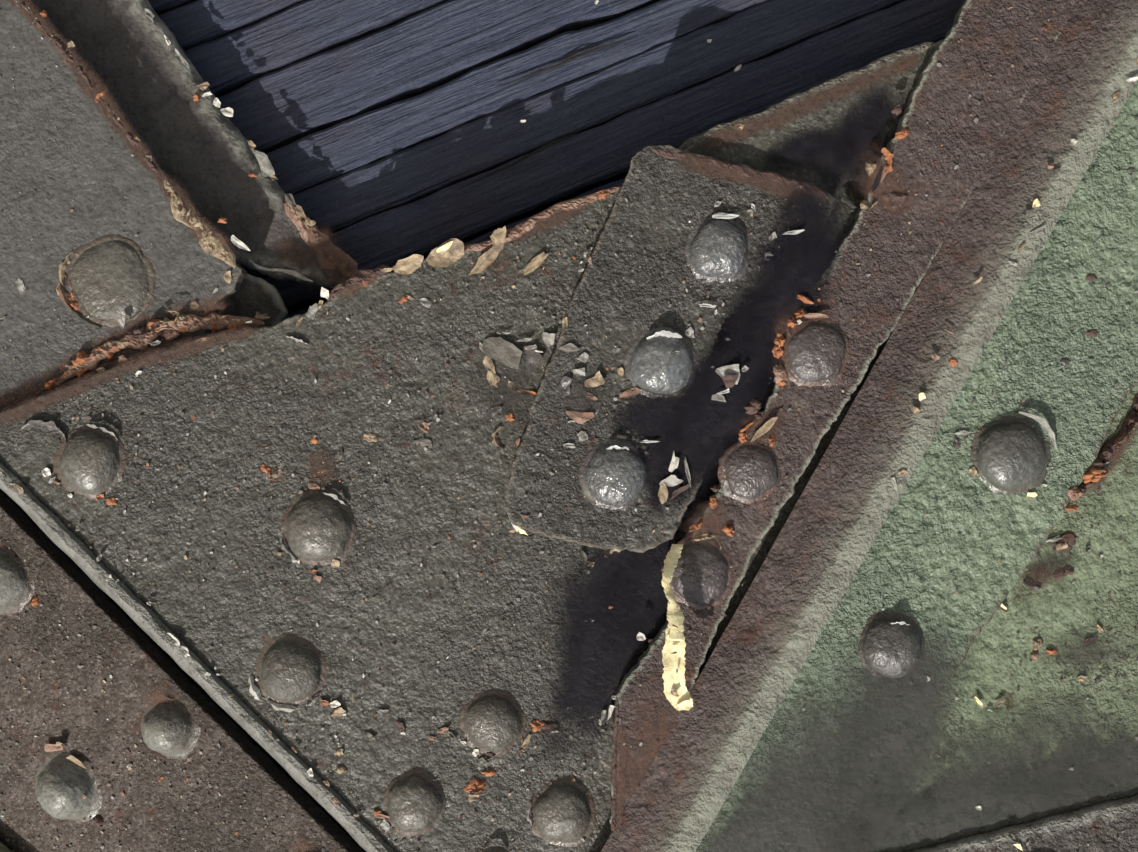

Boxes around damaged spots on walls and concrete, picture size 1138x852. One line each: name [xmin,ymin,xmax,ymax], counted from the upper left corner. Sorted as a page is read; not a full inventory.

corrosion [282,202,392,301]
corrosion [0,301,270,424]
corrosion [772,294,828,386]
corrosion [738,399,778,446]
corrosion [1065,395,1138,511]
corrosion [689,480,735,542]
corrosion [1024,553,1074,591]